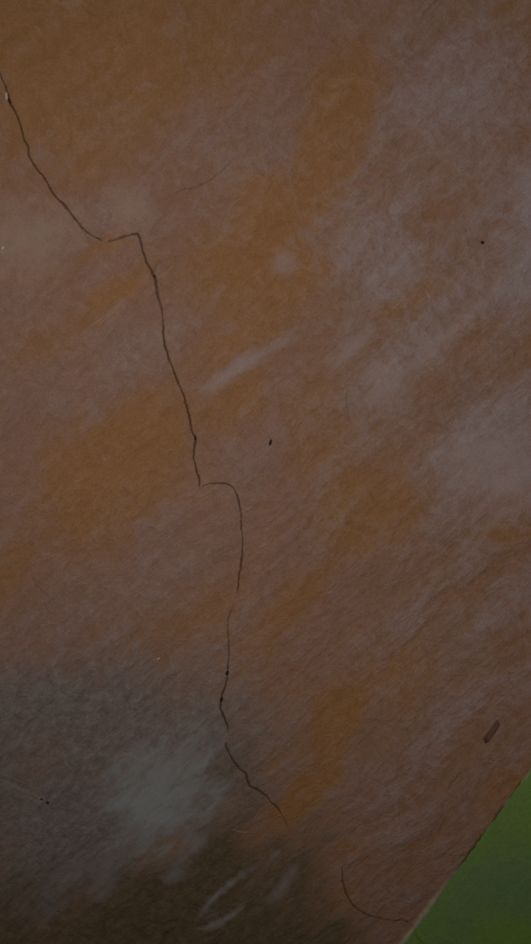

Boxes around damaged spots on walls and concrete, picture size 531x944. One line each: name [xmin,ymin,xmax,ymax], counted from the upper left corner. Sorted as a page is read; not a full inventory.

crack [1,77,77,221]
crack [162,327,200,483]
crack [220,664,278,808]